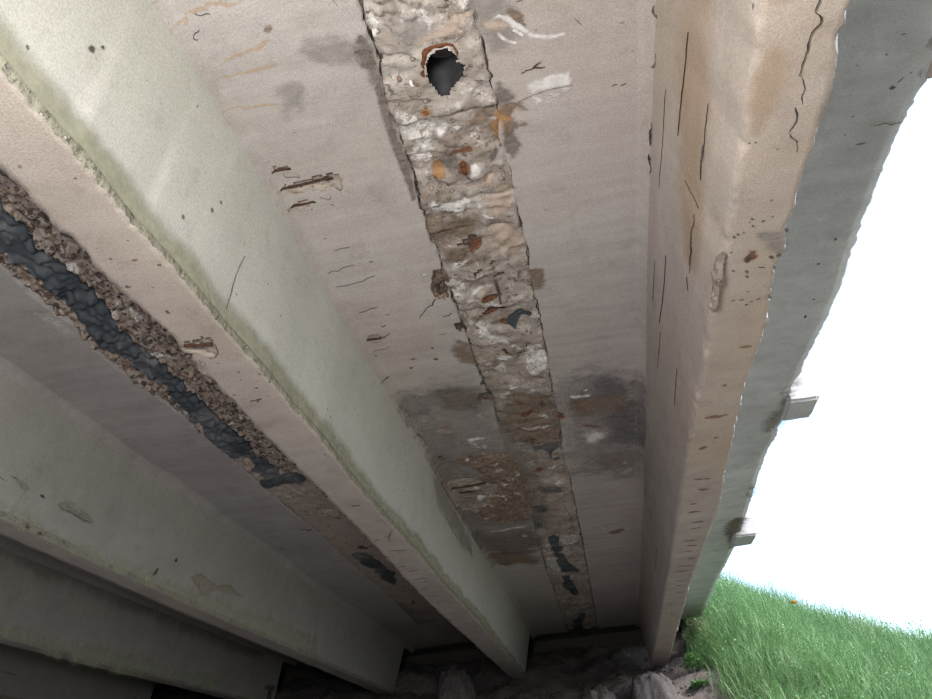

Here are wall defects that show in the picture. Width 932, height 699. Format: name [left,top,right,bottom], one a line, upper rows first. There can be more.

crack [359,0,383,64]
rust [472,82,527,161]
efflorescence [519,73,572,103]
crack [648,32,688,176]
crack [788,0,822,153]
rust [422,146,472,179]
spalling [442,153,481,178]
crack [652,105,708,405]
spalling [420,267,451,317]
spalling [180,336,219,375]
rust [450,341,475,364]
damp [400,375,646,572]